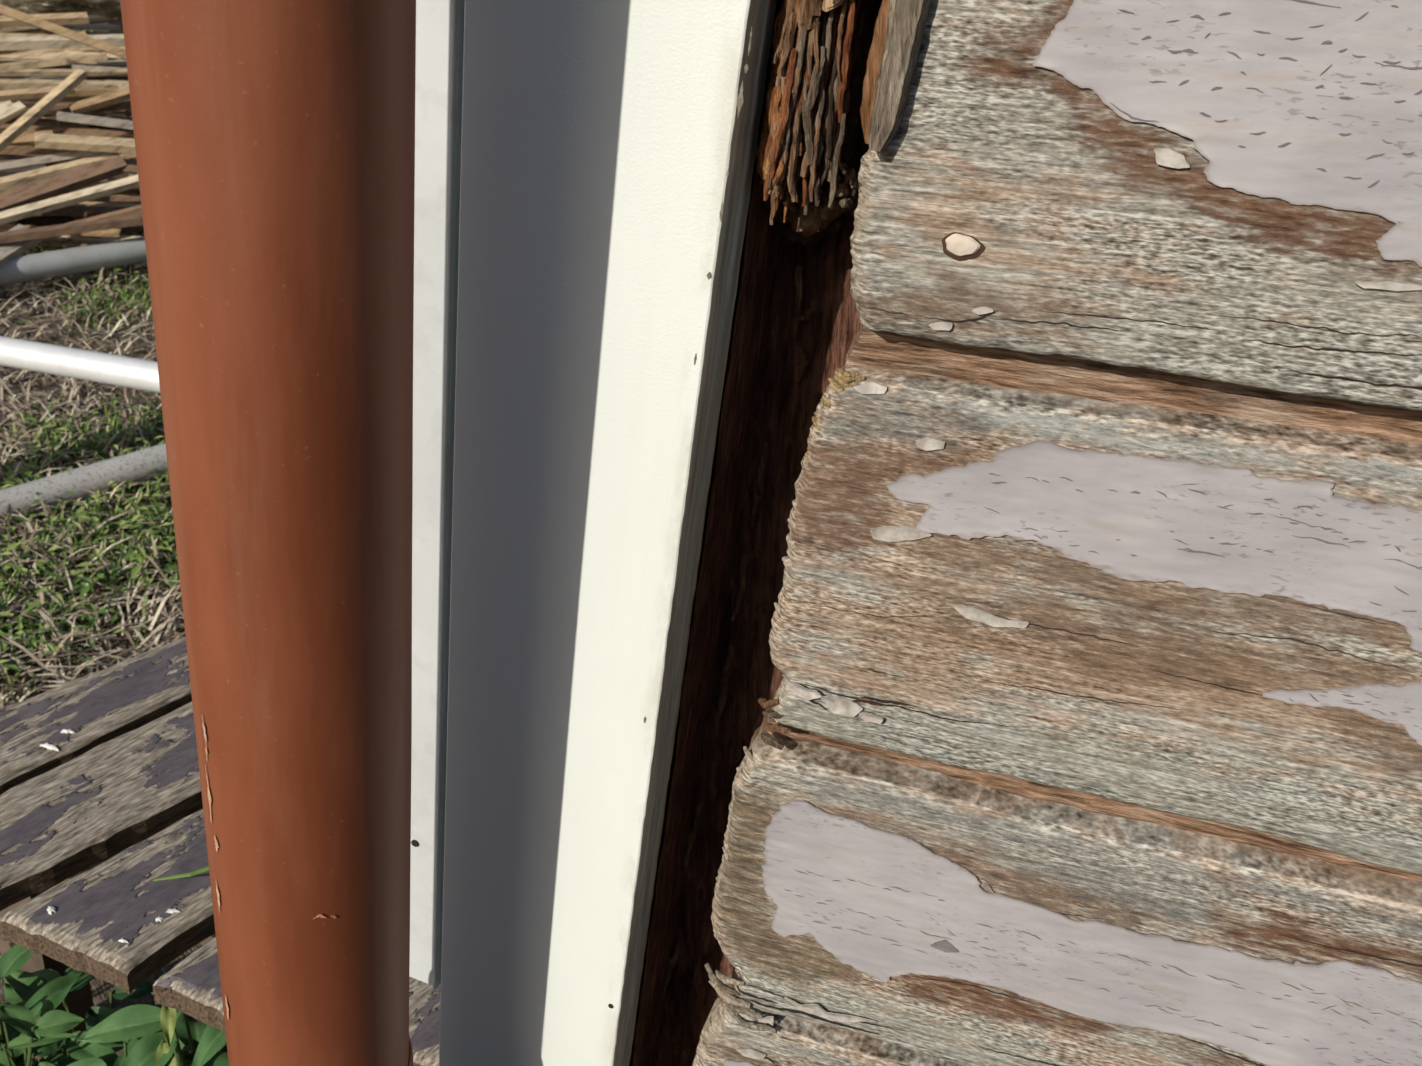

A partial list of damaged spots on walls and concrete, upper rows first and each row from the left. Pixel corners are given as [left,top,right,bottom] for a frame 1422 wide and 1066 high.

peeling [821,0,844,12]
peeling [1033,0,1422,267]
peeling [1355,281,1422,291]
peeling [972,307,994,315]
peeling [929,321,953,331]
peeling [854,381,887,394]
peeling [916,437,945,451]
peeling [870,440,1422,653]
peeling [782,674,883,724]
peeling [1262,679,1422,746]
peeling [761,800,1422,1066]
peeling [723,1048,766,1066]